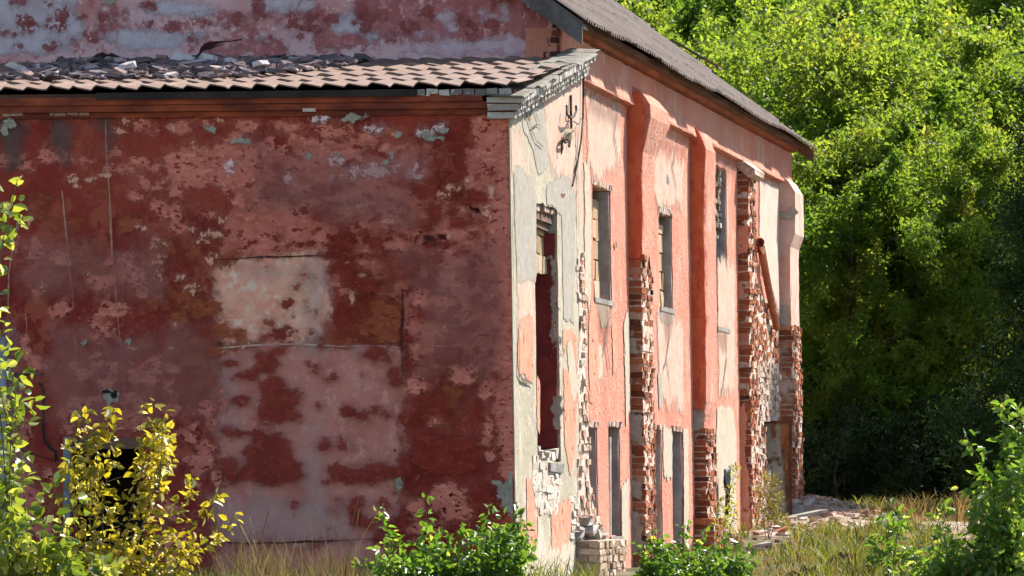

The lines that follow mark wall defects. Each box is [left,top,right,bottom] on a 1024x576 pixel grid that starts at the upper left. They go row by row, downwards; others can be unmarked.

peeling [0,0,198,59]
peeling [200,0,560,58]
flaking render [0,78,799,576]